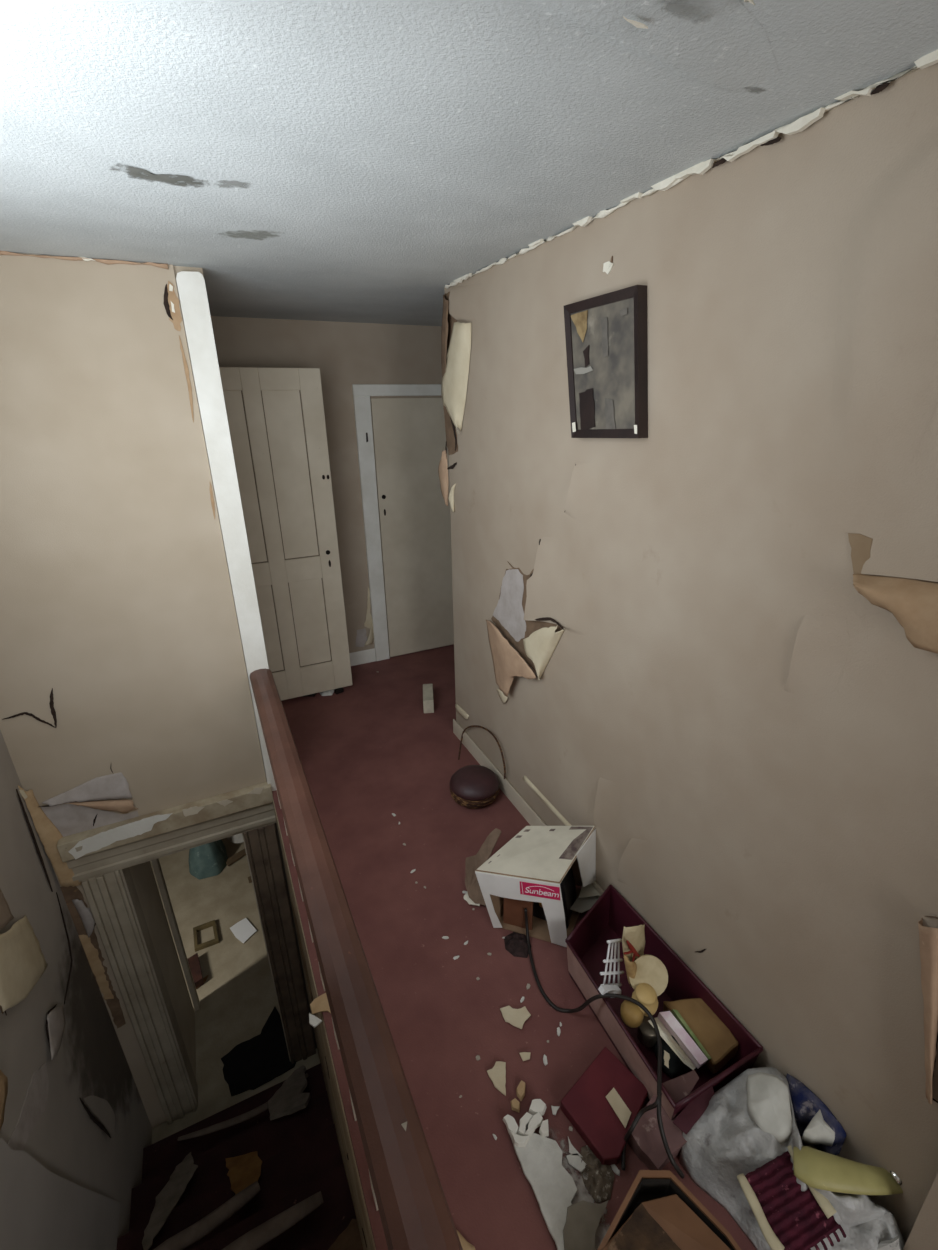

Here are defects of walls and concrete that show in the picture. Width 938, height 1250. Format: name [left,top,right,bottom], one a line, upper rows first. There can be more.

water stain [113,166,203,187]
spalling [445,49,938,289]
peeling [493,569,526,642]
crack [2,686,57,728]
peeling [16,785,233,892]
peeling [0,889,48,1016]
peeling [918,916,938,1104]